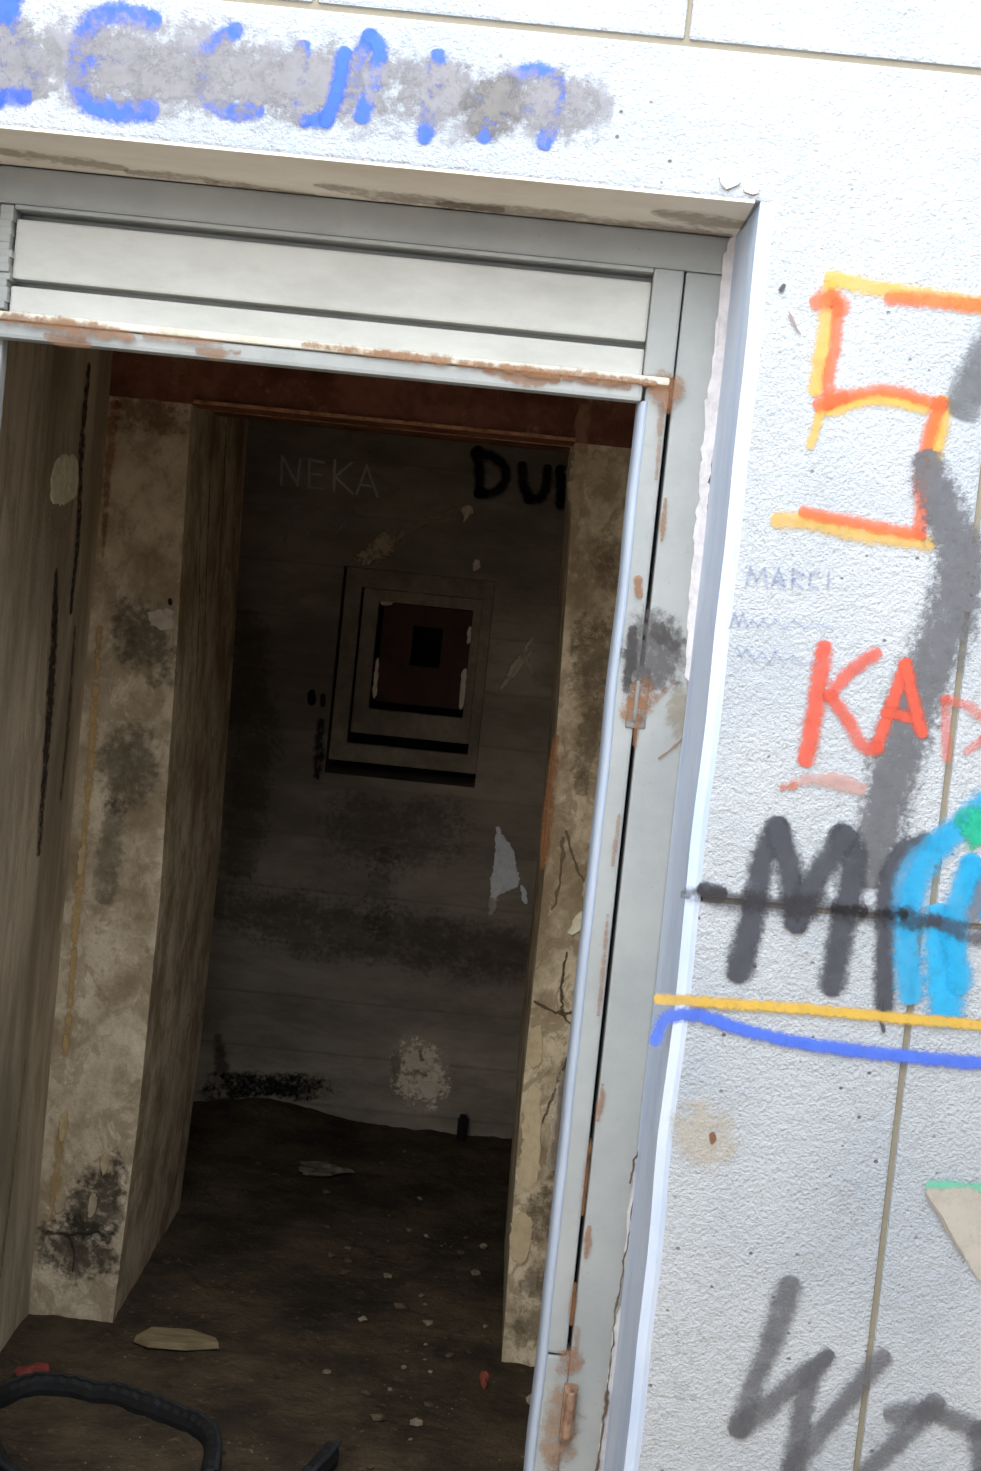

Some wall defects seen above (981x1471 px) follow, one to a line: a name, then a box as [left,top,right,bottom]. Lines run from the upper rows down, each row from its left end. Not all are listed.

corrosion [301,342,684,413]
water stain [113,597,175,687]
flaking render [490,826,528,904]
crack [551,830,585,910]
spalling [390,1034,452,1114]
crack [533,952,572,1124]
mould [38,1152,126,1279]
corrosion [540,1349,584,1470]